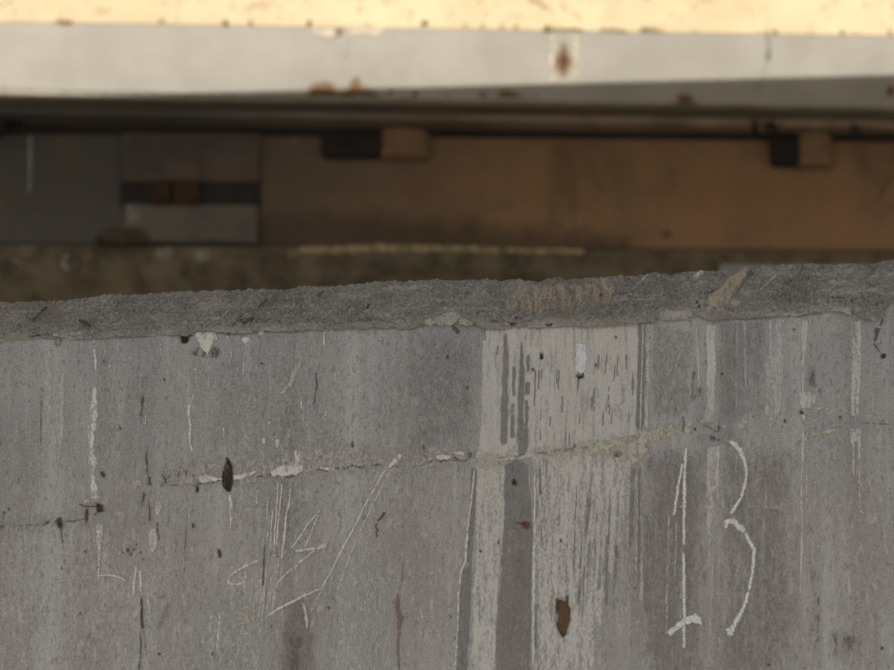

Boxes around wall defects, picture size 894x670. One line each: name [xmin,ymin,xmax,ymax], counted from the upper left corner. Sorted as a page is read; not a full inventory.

rust [307,80,375,96]
rust [555,44,571,77]
crack [260,441,399,478]
water stain [799,319,862,597]
crack [14,504,96,543]
crack [142,479,238,540]
water stain [160,319,788,670]
crack [138,598,147,670]